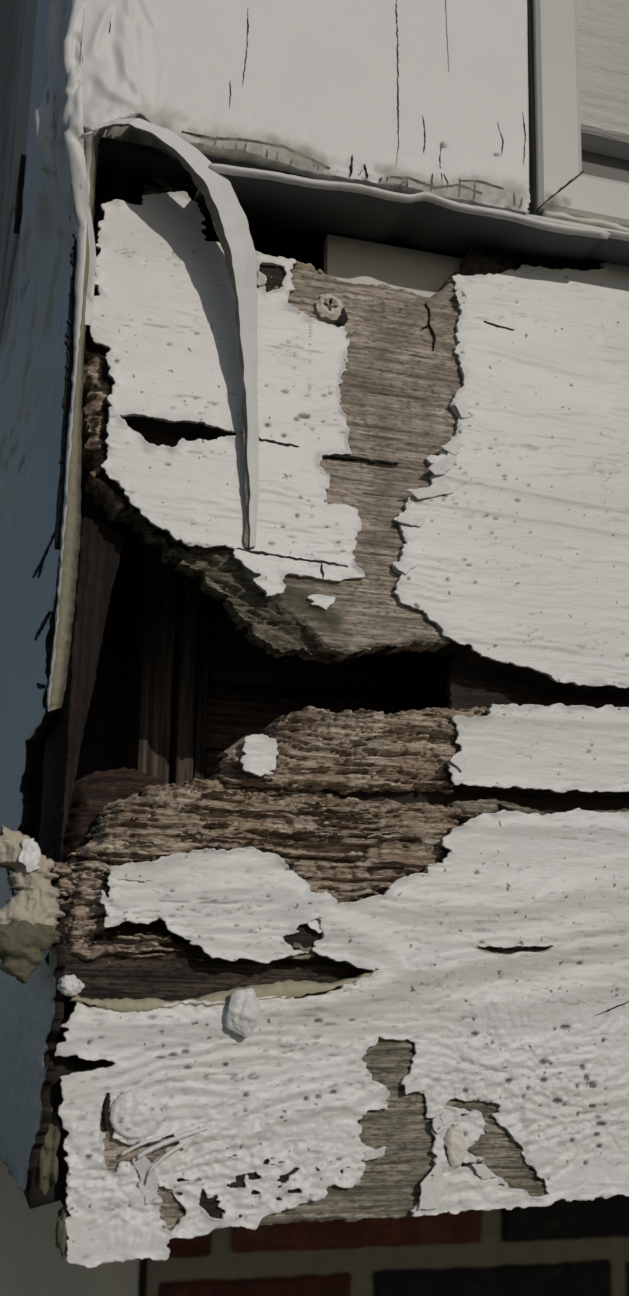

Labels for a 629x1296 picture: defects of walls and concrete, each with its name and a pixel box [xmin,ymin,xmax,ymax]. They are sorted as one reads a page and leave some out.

crack [181,0,526,208]
peeling [256,262,471,662]
peeling [208,706,488,795]
peeling [282,918,325,960]
peeling [100,1112,208,1231]
peeling [259,1037,547,1226]